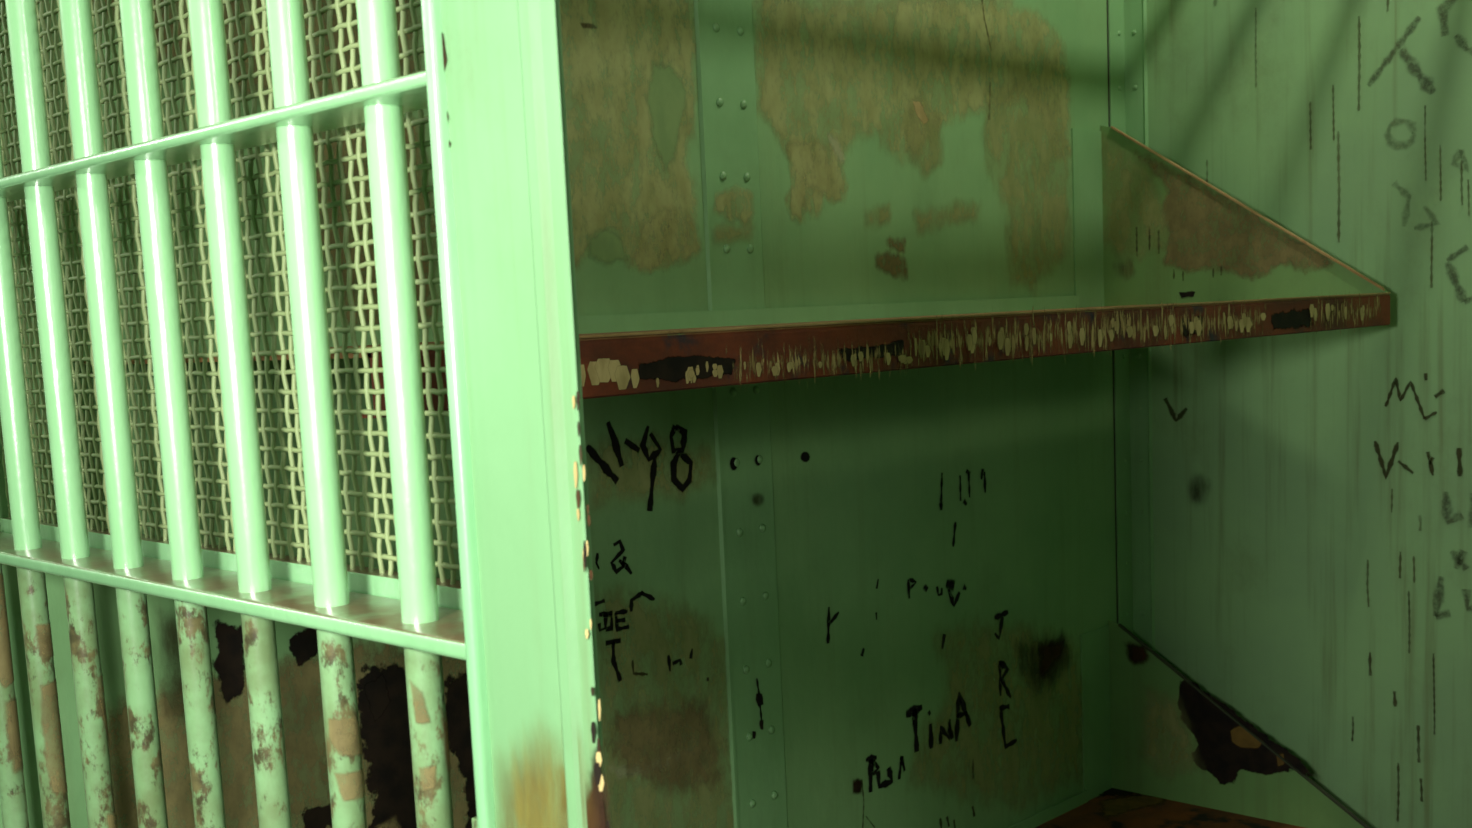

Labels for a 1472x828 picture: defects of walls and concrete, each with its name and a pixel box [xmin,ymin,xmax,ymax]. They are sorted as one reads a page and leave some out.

peeling [870,209,907,277]
peeling [572,291,1381,581]
rust [0,574,23,771]
rust [36,623,54,656]
rust [42,679,68,793]
rust [99,675,110,746]
rust [329,717,366,801]
rust [413,690,450,789]
peeling [591,687,610,828]
peeling [1146,680,1318,785]